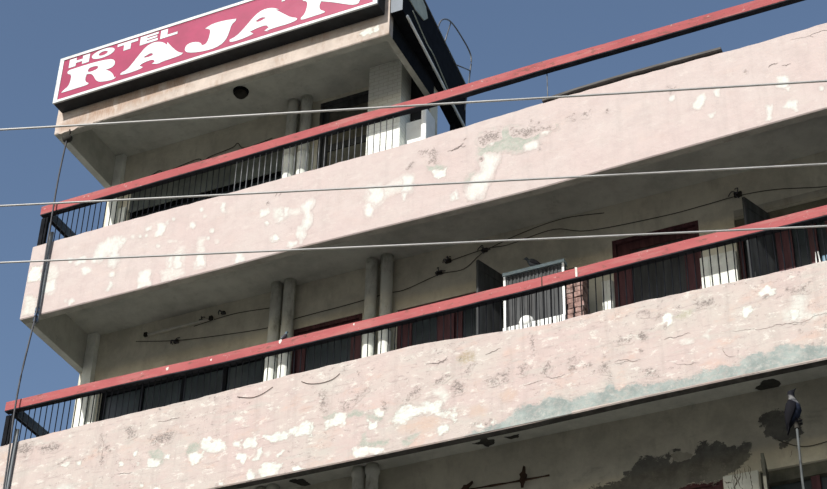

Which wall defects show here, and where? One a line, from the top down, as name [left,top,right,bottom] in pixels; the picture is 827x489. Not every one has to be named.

peeling [690,88,721,119]
peeling [765,74,800,122]
peeling [449,123,560,202]
peeling [259,196,316,249]
peeling [361,172,416,220]
peeling [67,207,220,292]
peeling [21,262,60,317]
damp [691,296,716,310]
damp [612,330,649,354]
flaking render [465,339,827,450]
peeling [185,386,458,486]
flaking render [589,440,753,489]